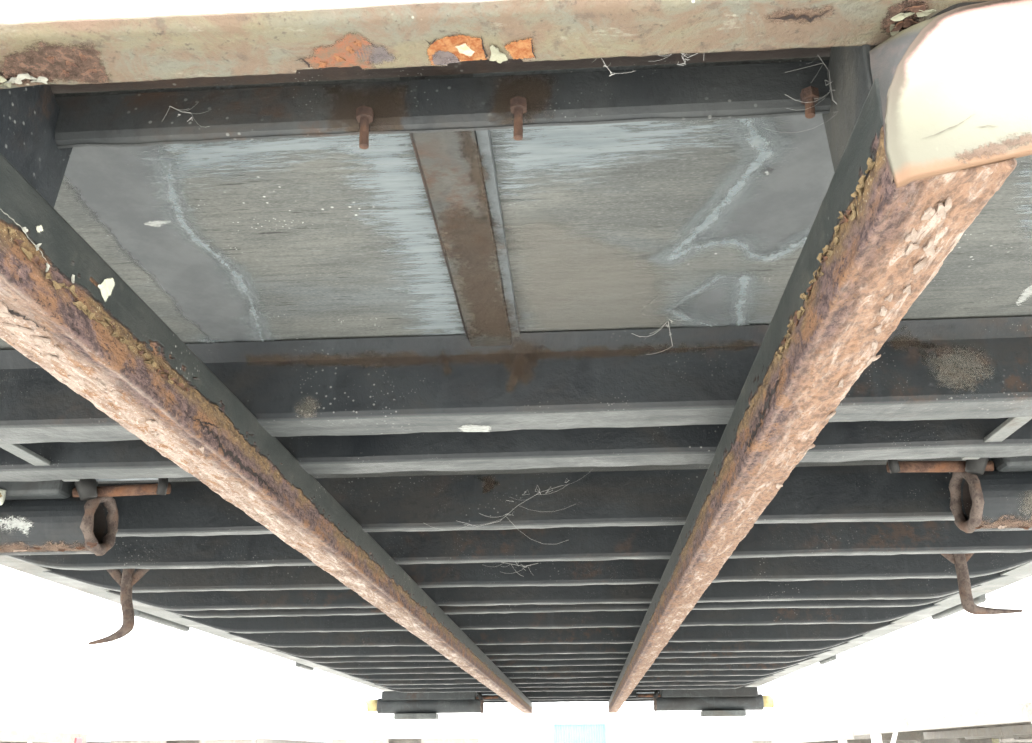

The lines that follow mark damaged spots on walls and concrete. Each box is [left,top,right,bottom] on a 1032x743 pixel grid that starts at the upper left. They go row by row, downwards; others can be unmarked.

peeling [489,45,508,63]
peeling [0,72,54,88]
corrosion [956,133,1032,163]
leakage [491,114,835,332]
leakage [64,133,466,343]
corrosion [246,131,519,374]
corrosion [529,340,754,360]
corrosion [975,516,1032,530]
corrosion [0,541,97,553]